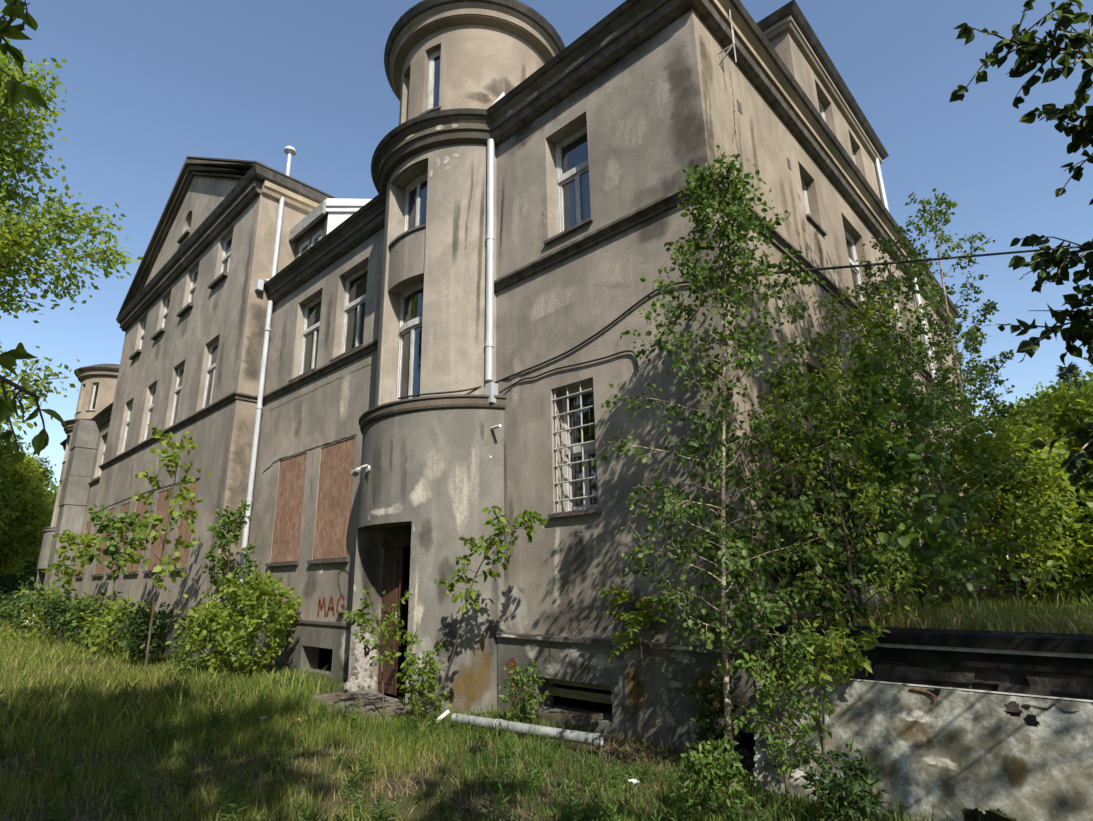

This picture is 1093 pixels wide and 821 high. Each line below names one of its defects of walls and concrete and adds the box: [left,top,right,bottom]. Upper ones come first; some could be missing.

leakage [652,76,687,116]
spalling [343,620,380,693]
peeling [569,648,640,672]